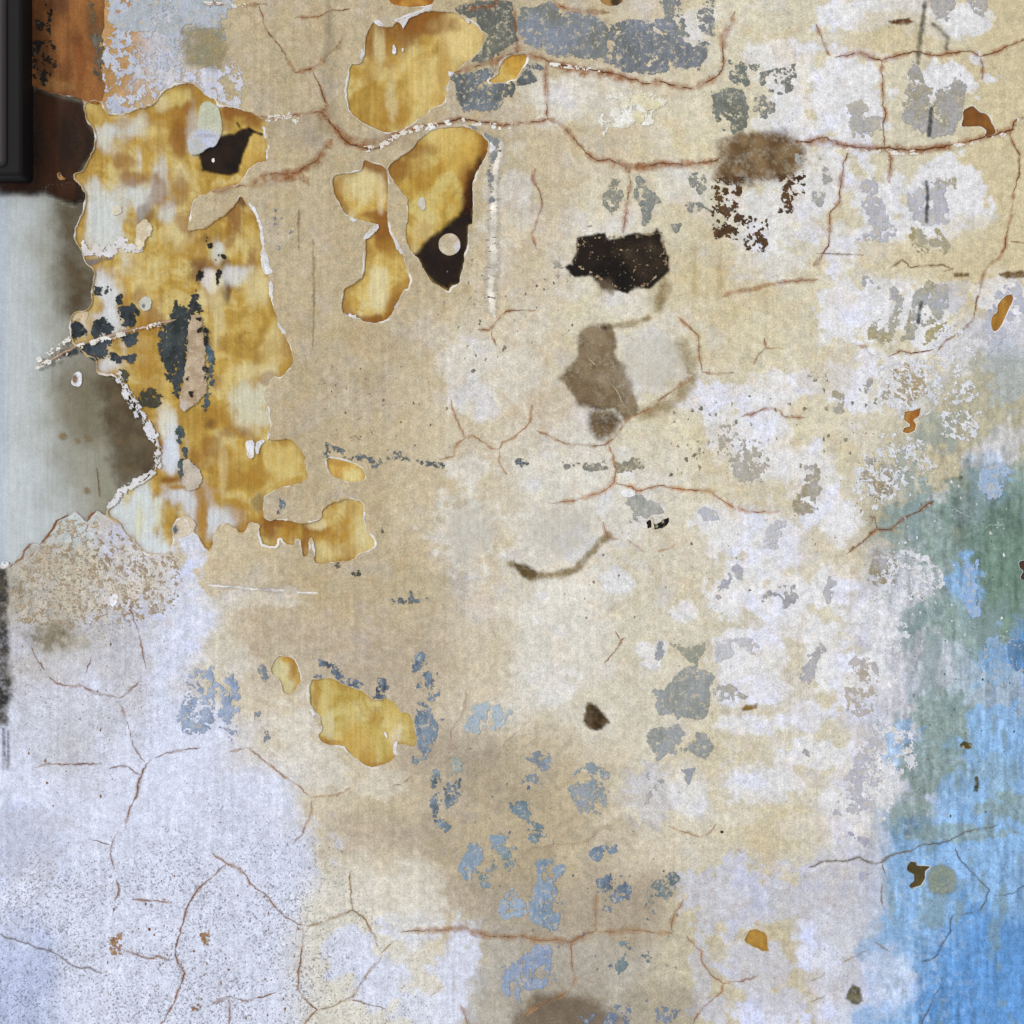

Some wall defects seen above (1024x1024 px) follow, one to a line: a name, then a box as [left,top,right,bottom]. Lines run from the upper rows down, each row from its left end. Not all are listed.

crack [204,1,735,228]
peeling [330,0,715,324]
crack [726,24,1024,296]
peeling [8,0,384,577]
damp [559,316,692,438]
crack [558,385,765,513]
damp [509,535,609,580]
crack [32,609,201,817]
peeling [258,651,440,769]
peeling [429,757,463,833]
crack [93,840,385,1024]
peeling [497,857,566,931]